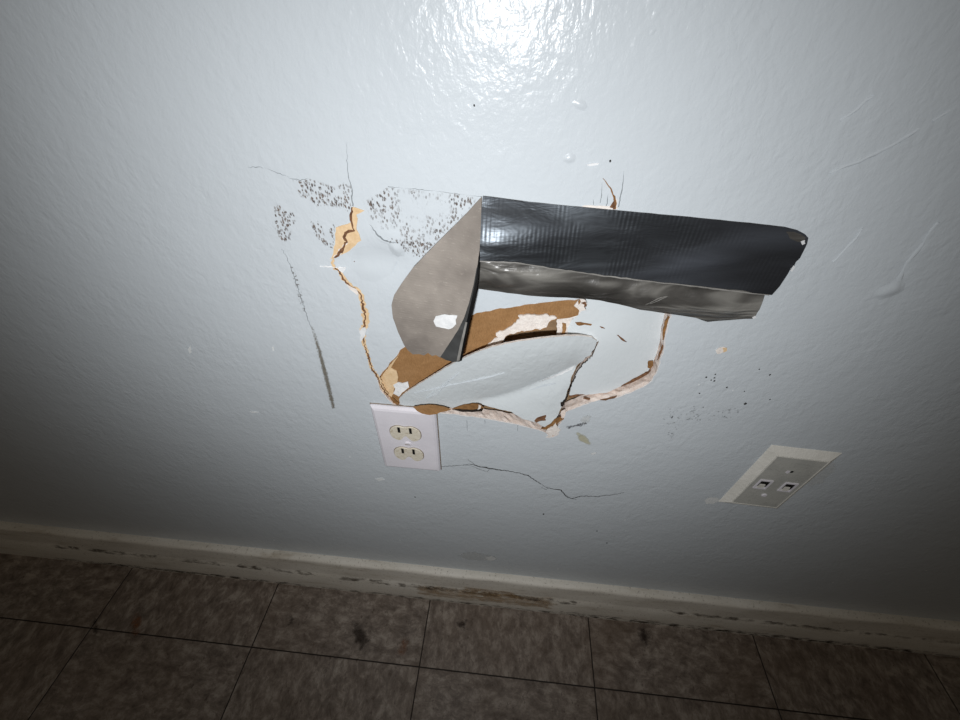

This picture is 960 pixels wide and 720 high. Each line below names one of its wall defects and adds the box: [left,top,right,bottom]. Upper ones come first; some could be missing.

peeling [331,207,364,259]
spalling [463,299,587,357]
spalling [378,347,452,405]
spalling [413,313,671,438]
crack [441,461,621,500]